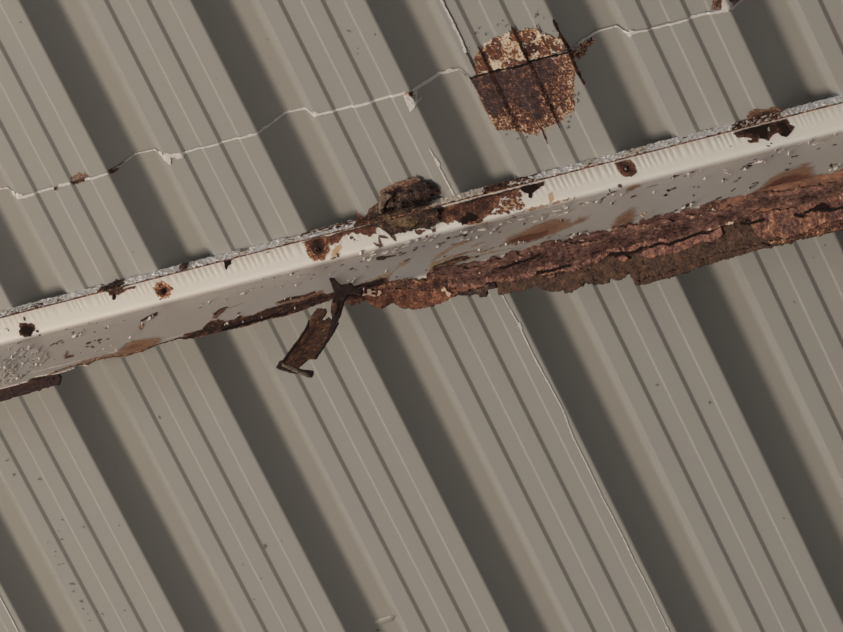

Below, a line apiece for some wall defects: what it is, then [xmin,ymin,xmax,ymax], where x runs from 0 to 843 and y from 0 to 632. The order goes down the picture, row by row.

crack [579,0,743,44]
crack [0,0,477,199]
peeling [121,220,356,286]
corrosion [436,173,544,226]
peeling [359,184,636,267]
corrosion [425,219,584,278]
corrosion [459,19,595,144]
corrosion [615,160,640,191]
peeling [507,95,843,191]
corrosion [730,106,794,143]
peeling [0,322,109,385]
crack [502,295,669,632]